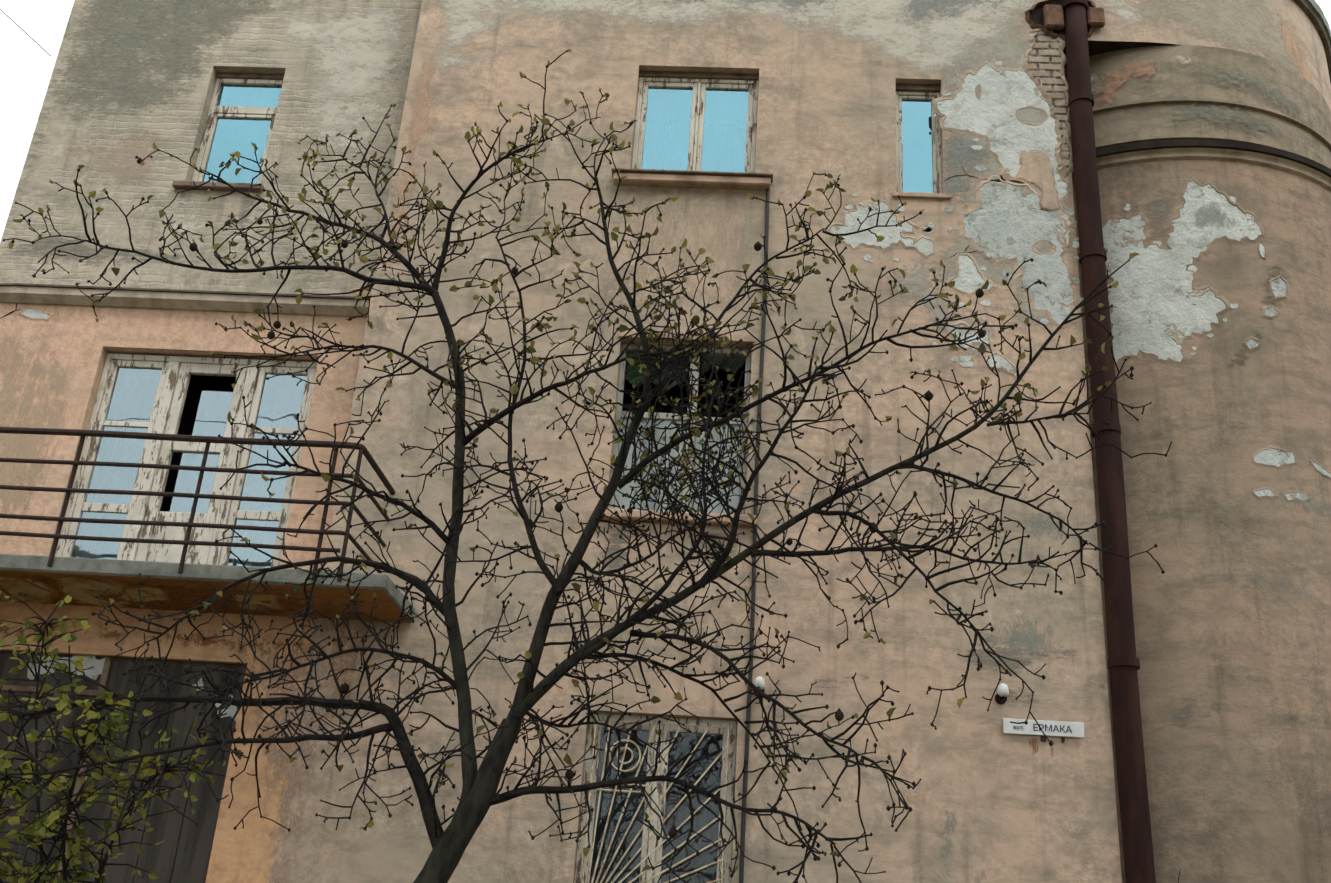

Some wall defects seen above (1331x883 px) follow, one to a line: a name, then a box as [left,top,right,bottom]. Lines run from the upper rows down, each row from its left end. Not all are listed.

water stain [43,0,410,154]
water stain [390,0,1045,263]
water stain [170,193,209,236]
water stain [239,196,282,226]
flaking render [827,0,1084,382]
water stain [895,230,1052,335]
flaking render [1102,177,1267,369]
flaking render [1261,275,1289,320]
flaking render [1251,486,1311,504]
flaking render [1251,444,1331,480]